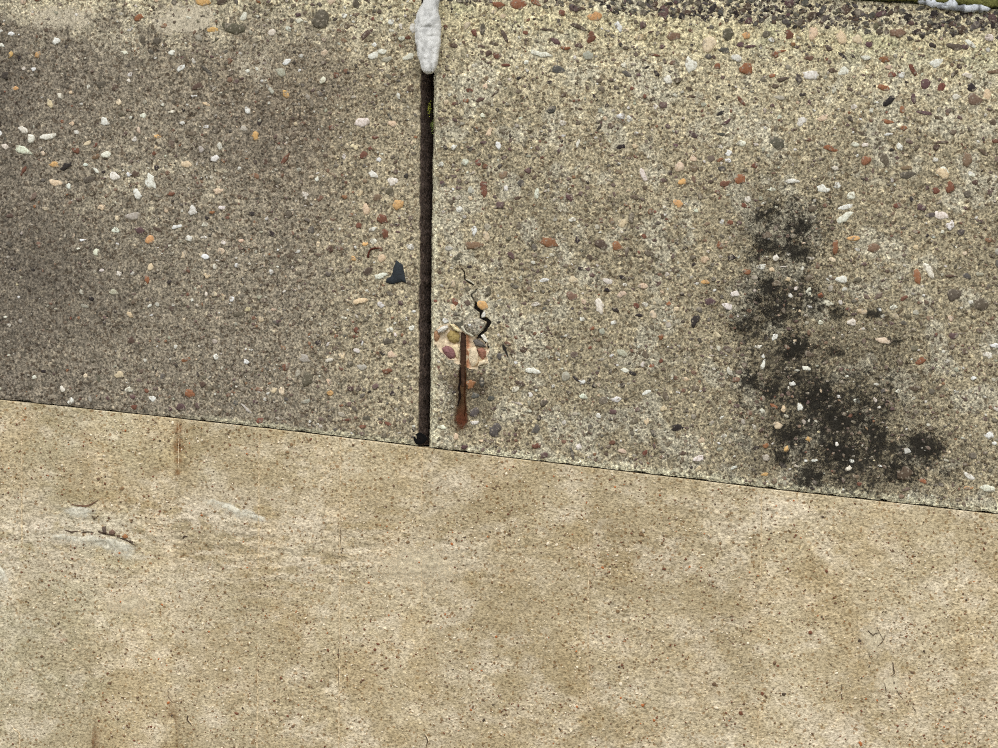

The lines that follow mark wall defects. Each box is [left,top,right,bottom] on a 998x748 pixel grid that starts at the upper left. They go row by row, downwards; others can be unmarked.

corrosion [454,365,467,430]
crack [461,268,491,348]
spalling [433,0,998,507]
mould [725,185,953,496]